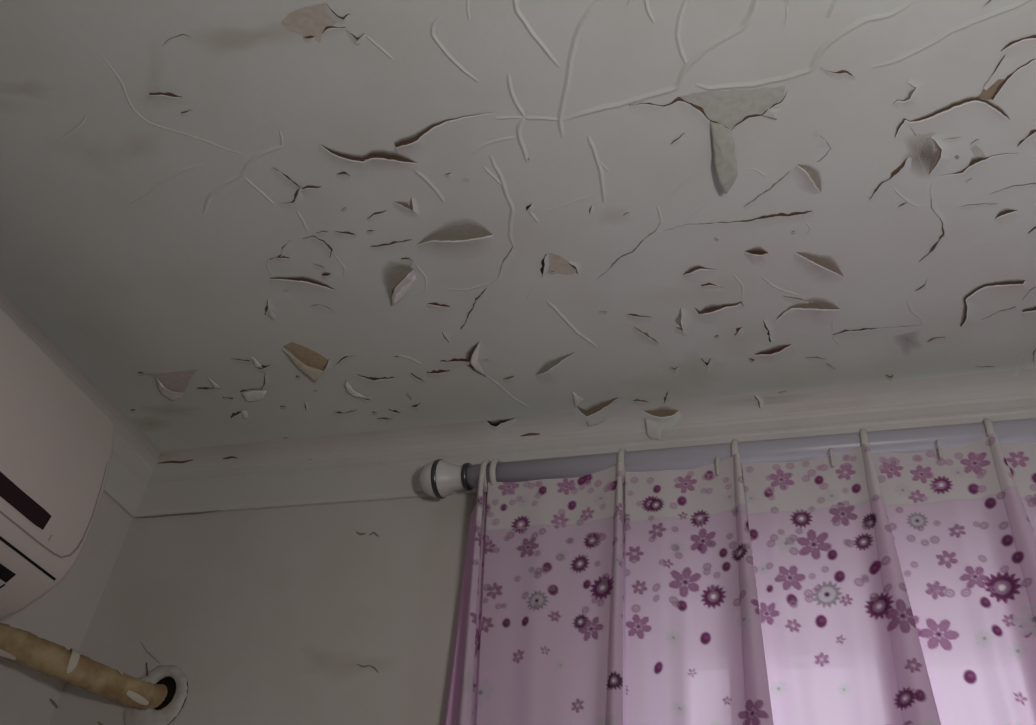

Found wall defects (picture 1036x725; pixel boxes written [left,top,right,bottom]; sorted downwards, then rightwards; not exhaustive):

peeling [281,3,367,46]
crack [430,0,479,82]
peeling [629,86,794,194]
crack [442,0,1036,347]
peeling [744,131,831,210]
peeling [267,167,496,308]
peeling [540,253,582,278]
peeling [282,342,356,410]
peeling [572,392,682,440]